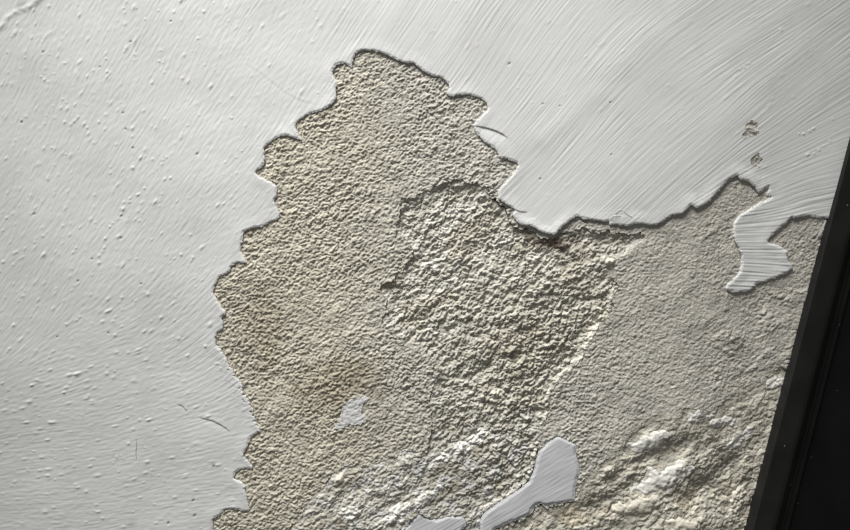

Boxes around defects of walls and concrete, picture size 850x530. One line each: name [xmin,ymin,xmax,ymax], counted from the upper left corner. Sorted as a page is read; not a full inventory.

peeling [213,50,827,530]